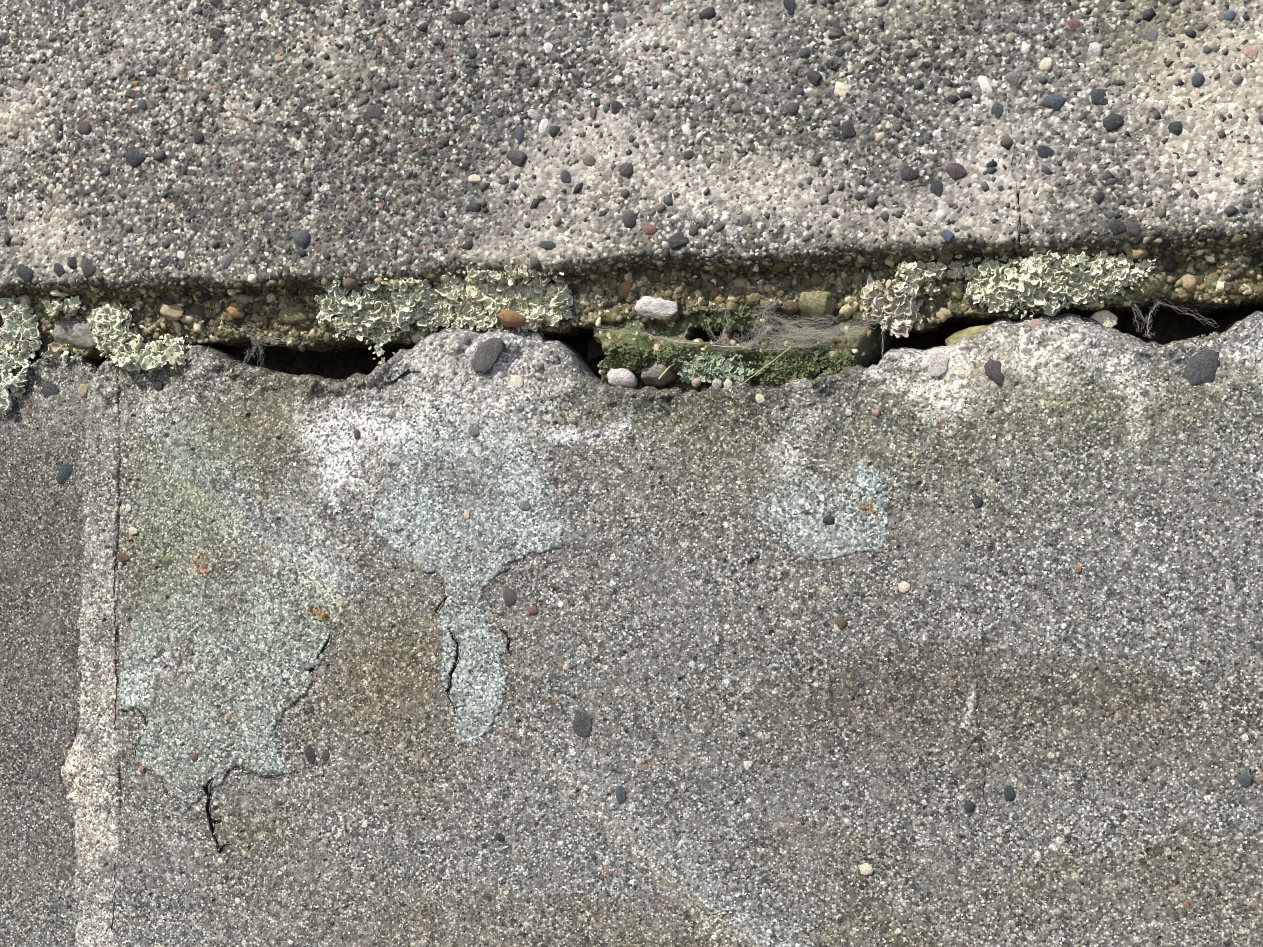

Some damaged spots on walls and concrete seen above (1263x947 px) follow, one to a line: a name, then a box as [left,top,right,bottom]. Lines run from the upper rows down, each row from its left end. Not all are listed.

spalling [203,345,401,397]
spalling [582,358,882,403]
spalling [1141,332,1225,356]
peeling [186,399,310,495]
peeling [121,451,335,810]
peeling [369,456,565,740]
crack [159,767,280,853]